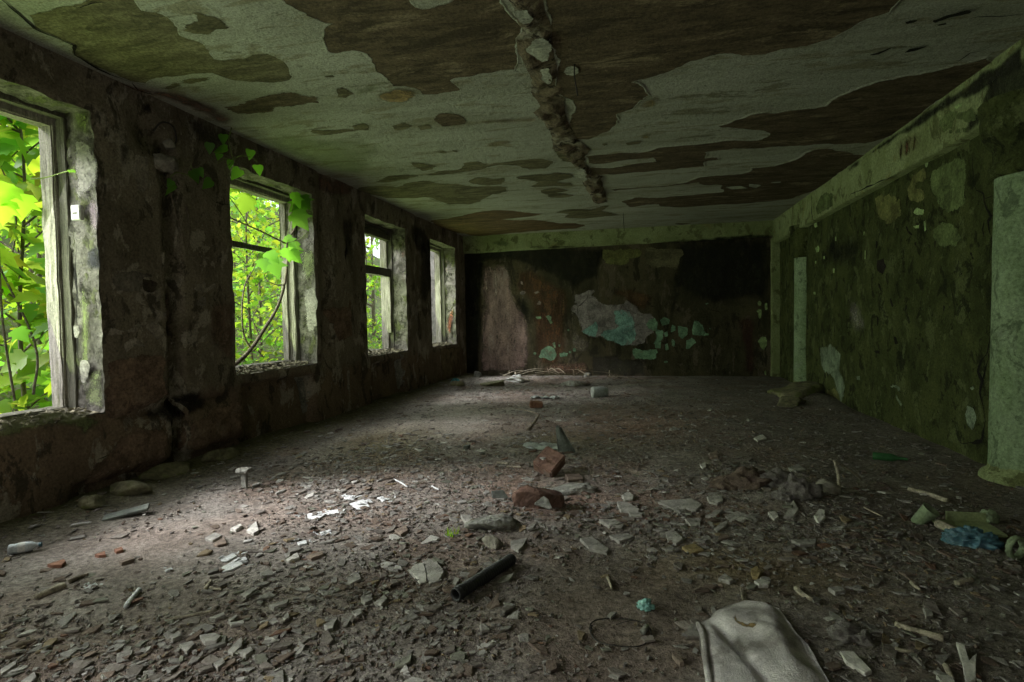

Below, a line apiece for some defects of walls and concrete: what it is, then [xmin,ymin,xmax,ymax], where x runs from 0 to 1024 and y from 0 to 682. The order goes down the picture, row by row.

peeling [26,0,318,114]
peeling [76,141,96,192]
peeling [281,0,994,245]
water stain [440,246,602,380]
peeling [571,290,711,363]